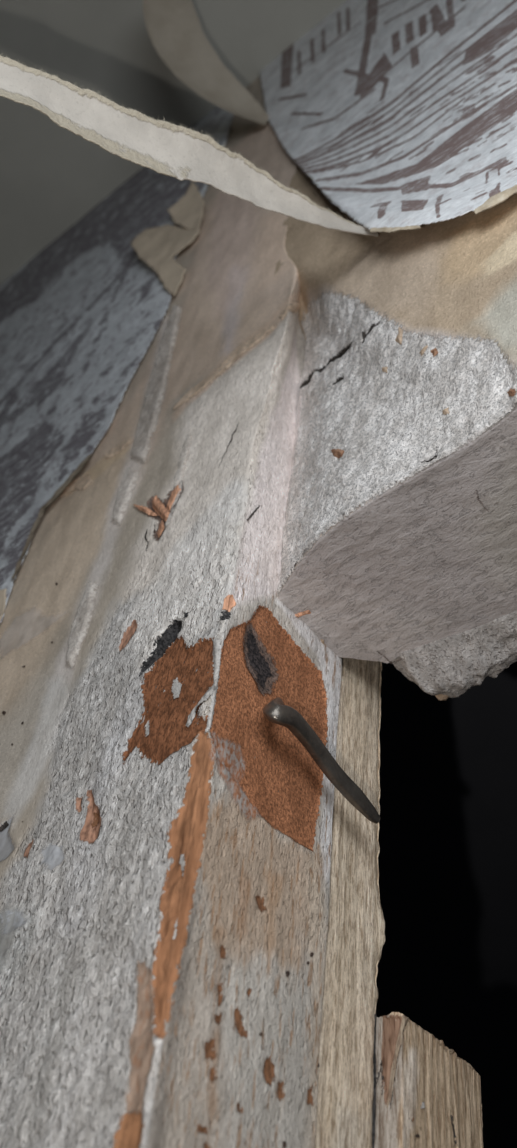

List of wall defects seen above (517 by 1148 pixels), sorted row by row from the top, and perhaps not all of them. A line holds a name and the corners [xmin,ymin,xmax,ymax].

crack [300,322,380,389]
spalling [119,620,137,651]
corrosion [215,983,248,1040]
corrosion [204,1039,217,1082]
corrosion [263,1056,285,1101]